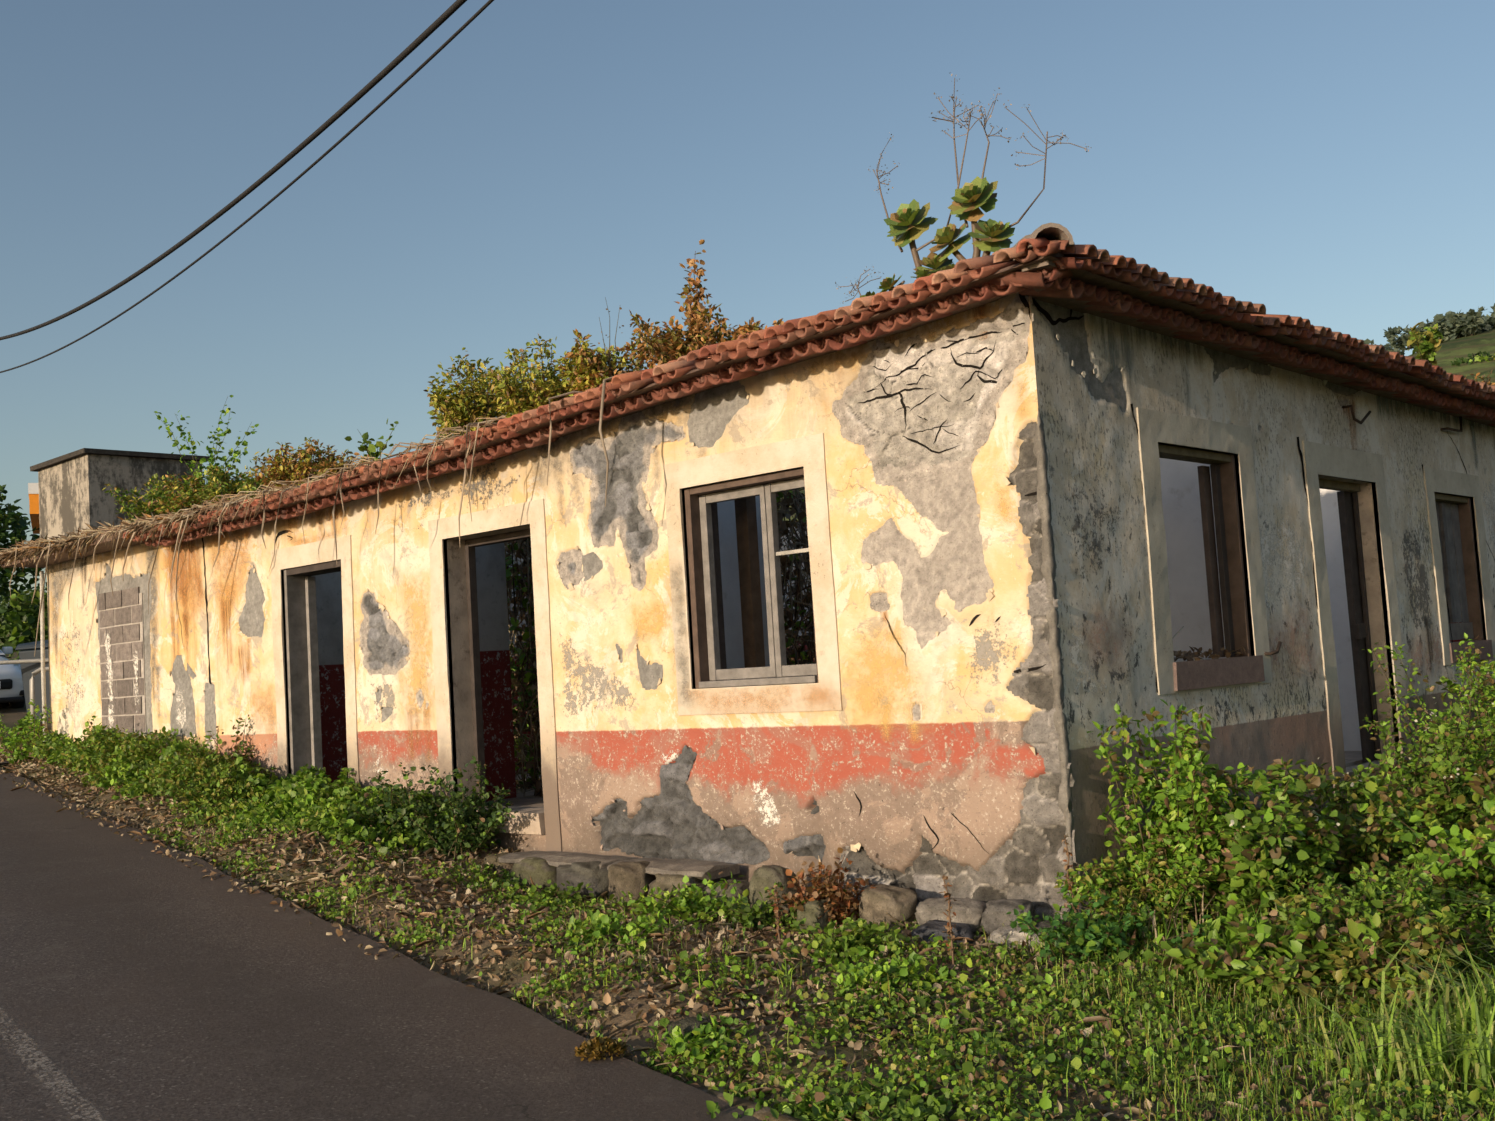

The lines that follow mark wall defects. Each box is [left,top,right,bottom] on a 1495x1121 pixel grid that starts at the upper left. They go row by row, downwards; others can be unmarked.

crack [859,292,1084,454]
spalling [556,381,750,591]
spalling [832,293,1127,649]
flaking render [61,563,217,740]
flaking render [238,565,265,637]
spalling [359,588,410,722]
peeling [559,638,663,715]
spalling [590,422,1111,922]